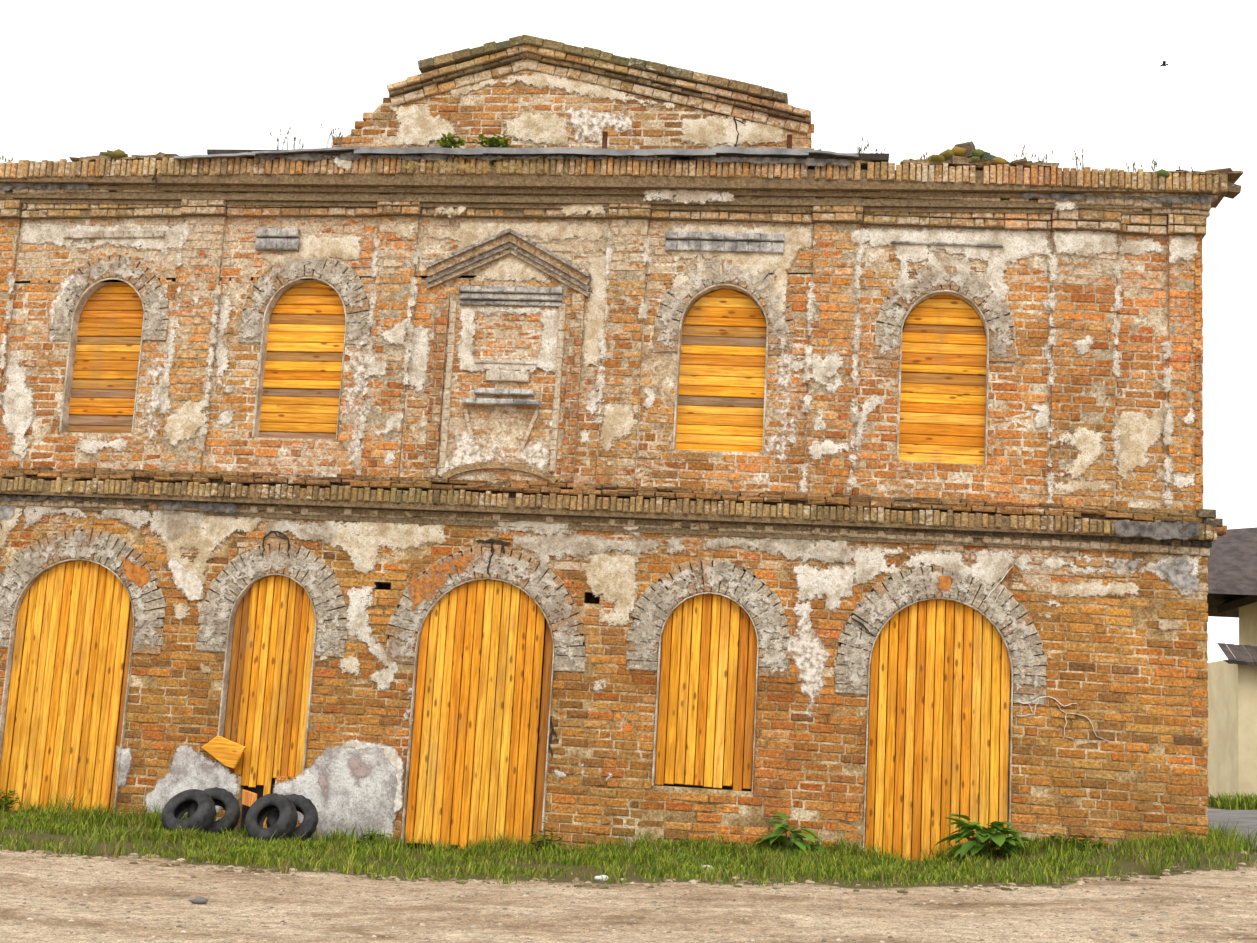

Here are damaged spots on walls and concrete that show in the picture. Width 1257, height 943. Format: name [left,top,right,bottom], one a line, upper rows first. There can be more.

flaking render [389,101,456,147]
flaking render [451,72,786,147]
flaking render [0,299,36,468]
flaking render [20,221,432,476]
flaking render [437,459,460,477]
flaking render [387,204,656,451]
flaking render [850,225,1201,357]
flaking render [1041,299,1057,387]
flaking render [1031,366,1196,509]
peeling [1110,284,1123,378]
flaking render [0,506,1202,700]
crack [1010,696,1109,741]